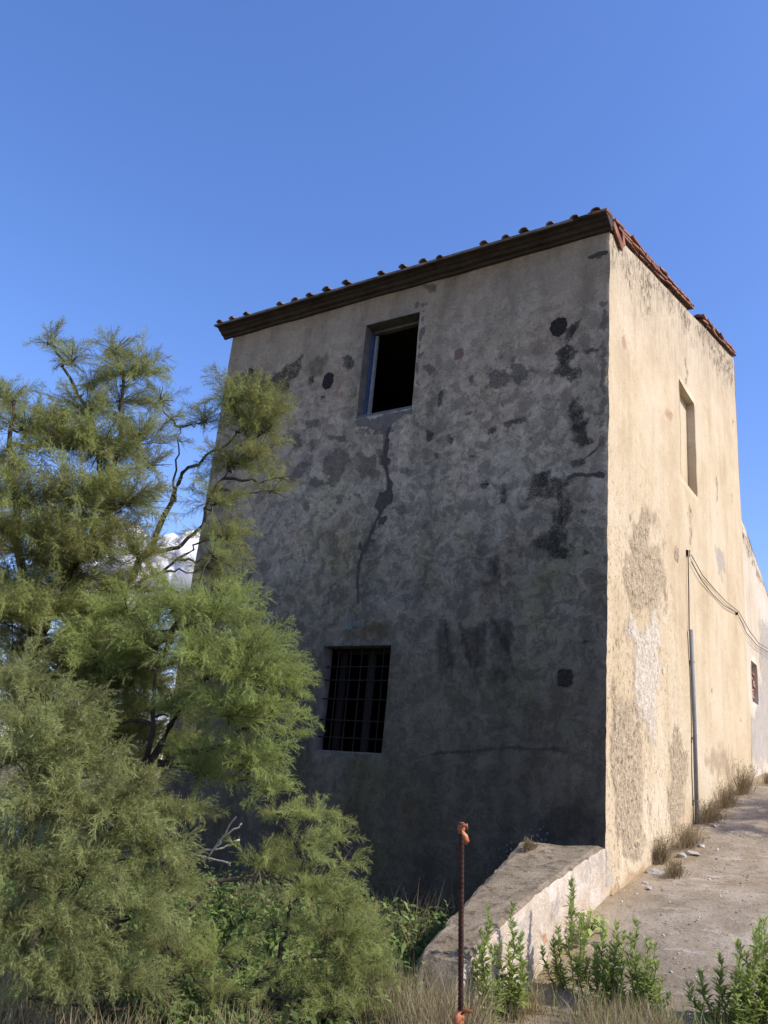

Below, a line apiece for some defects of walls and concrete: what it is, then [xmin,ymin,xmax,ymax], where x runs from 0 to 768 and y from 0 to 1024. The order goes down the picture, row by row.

spalling [550,317,567,337]
spalling [322,372,334,390]
crack [567,445,605,480]
crack [356,426,394,604]
spalling [623,508,668,619]
spalling [558,669,573,687]